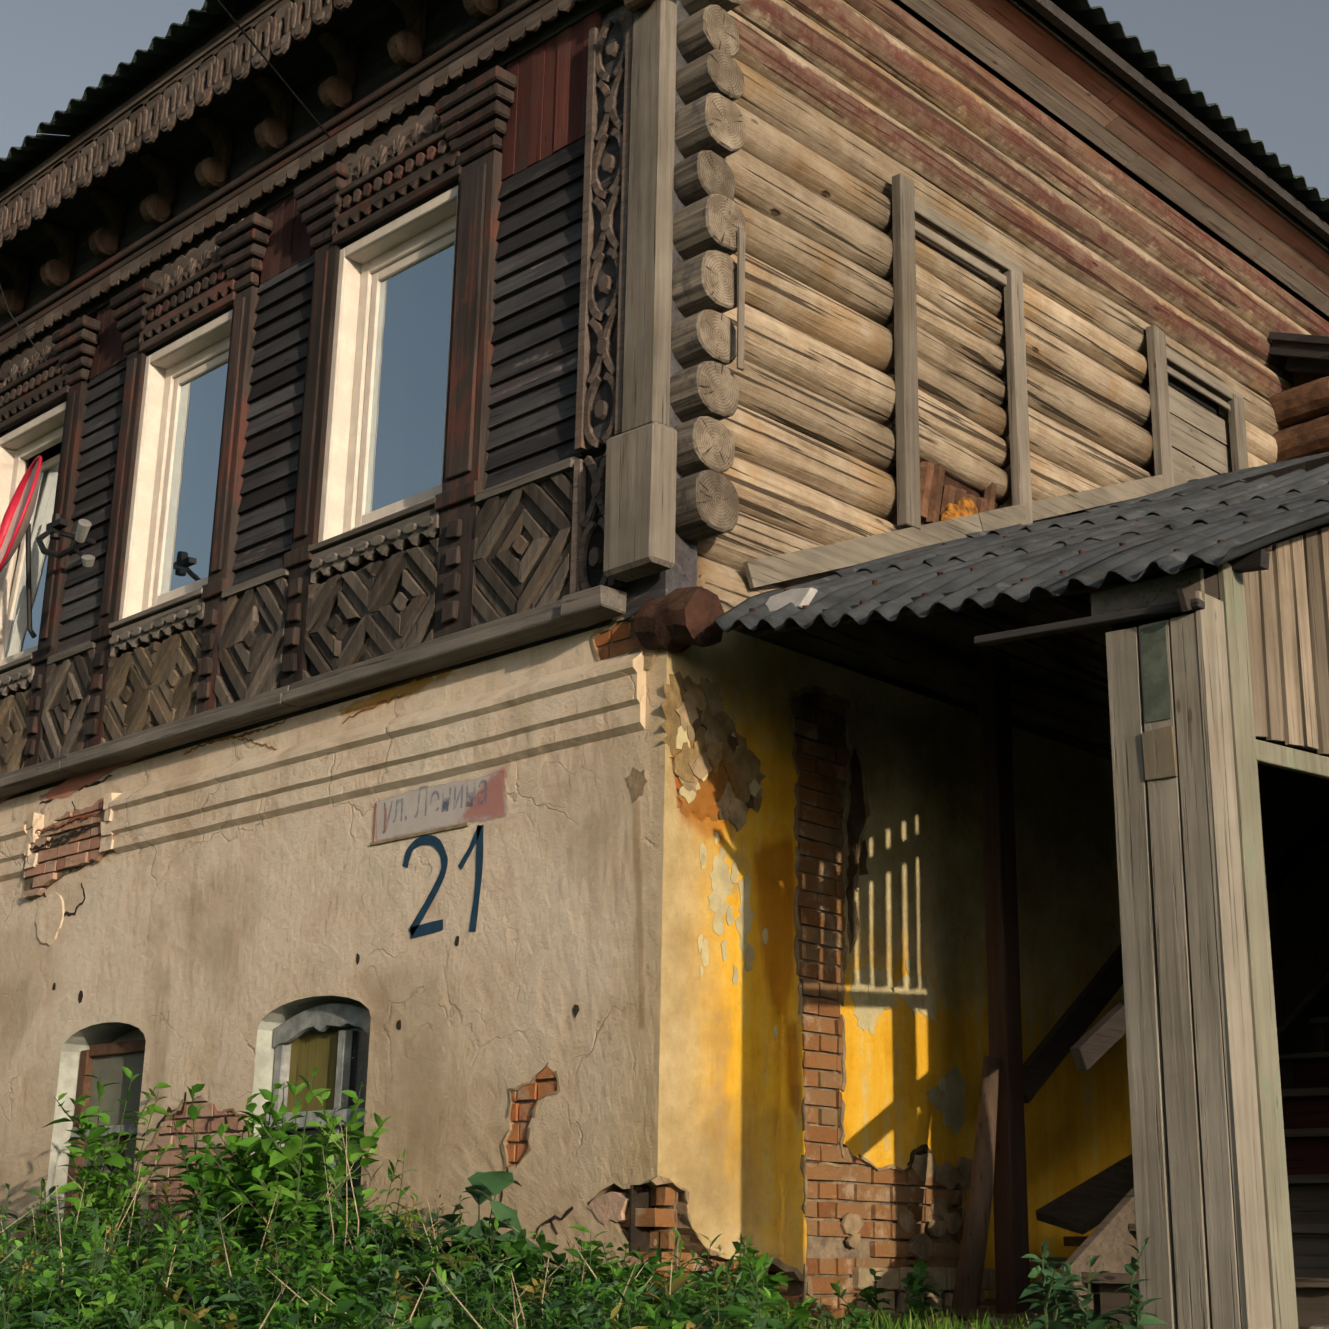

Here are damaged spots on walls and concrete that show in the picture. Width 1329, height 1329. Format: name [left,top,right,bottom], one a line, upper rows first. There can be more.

spalling [590,616,658,671]
spalling [21,752,157,900]
spalling [588,671,972,1321]
spalling [142,1092,254,1231]
spalling [500,1062,561,1172]